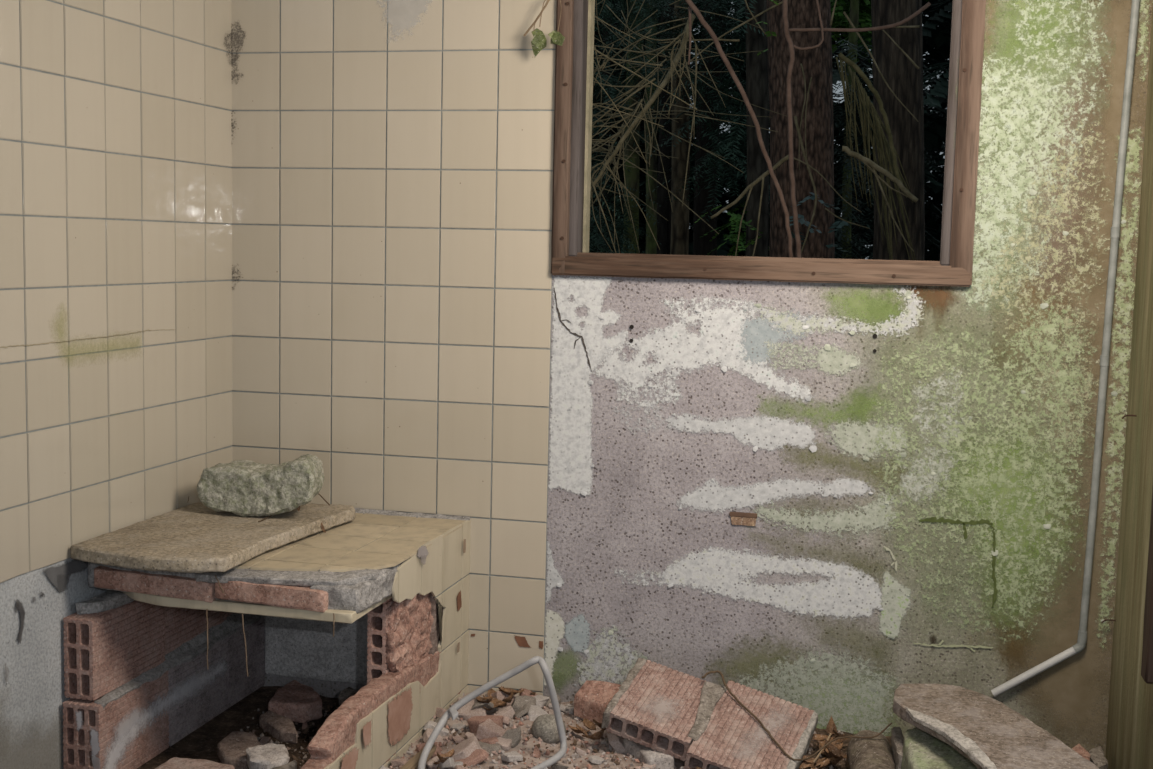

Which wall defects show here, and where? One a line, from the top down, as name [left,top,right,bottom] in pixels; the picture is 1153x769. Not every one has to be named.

water stain [223,22,246,82]
peeling [1136,0,1149,80]
crack [0,329,176,348]
crack [554,288,592,372]
peeling [548,0,1143,651]
water stain [1005,0,1150,737]
crack [919,517,998,607]